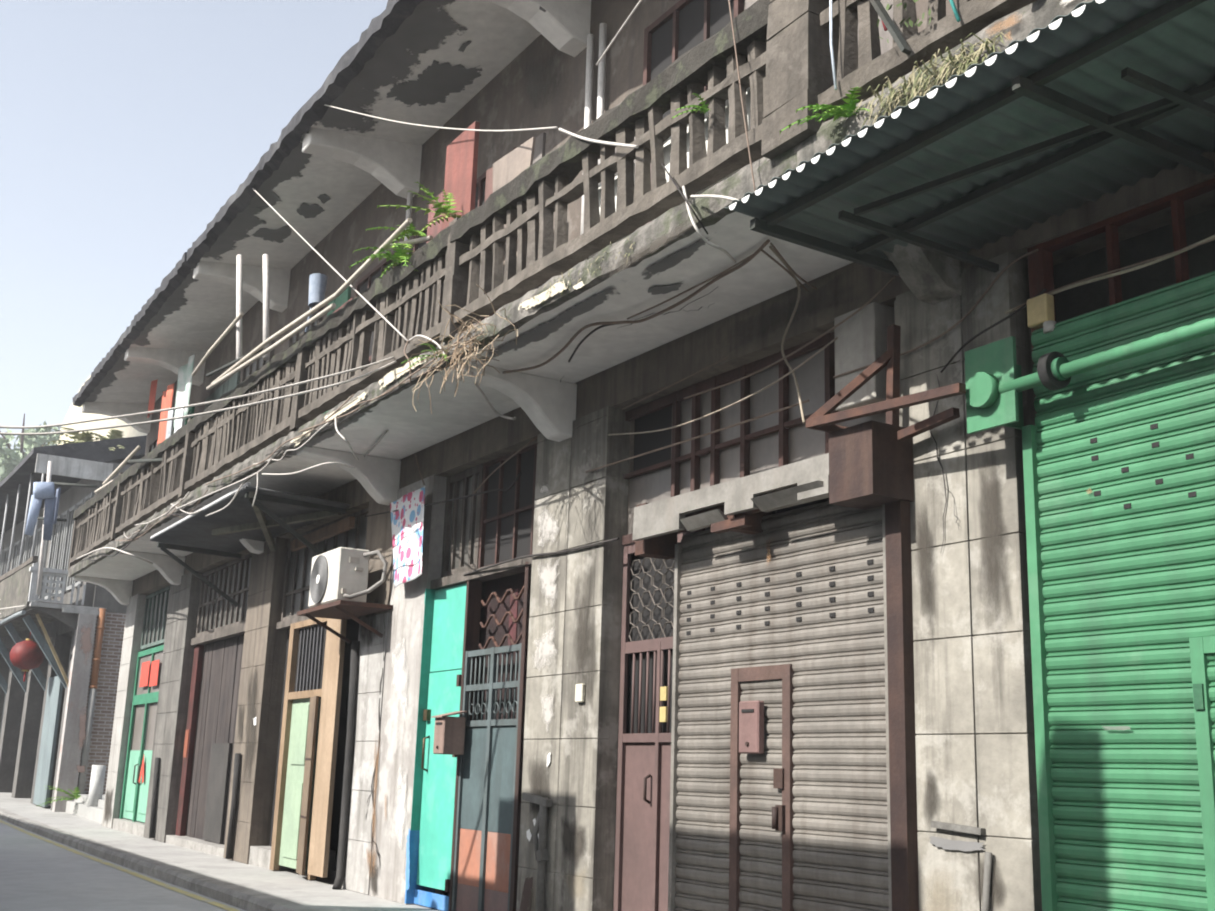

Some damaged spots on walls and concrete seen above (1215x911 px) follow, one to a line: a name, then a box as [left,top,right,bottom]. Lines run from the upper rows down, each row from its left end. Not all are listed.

peeling [386,41,482,107]
peeling [253,225,292,243]
peeling [297,194,331,219]
crack [930,376,959,551]
water stain [917,517,931,610]
water stain [979,473,1008,601]
water stain [575,578,594,693]
water stain [531,753,550,839]
water stain [925,775,936,821]
water stain [562,820,584,862]
water stain [978,862,1002,903]